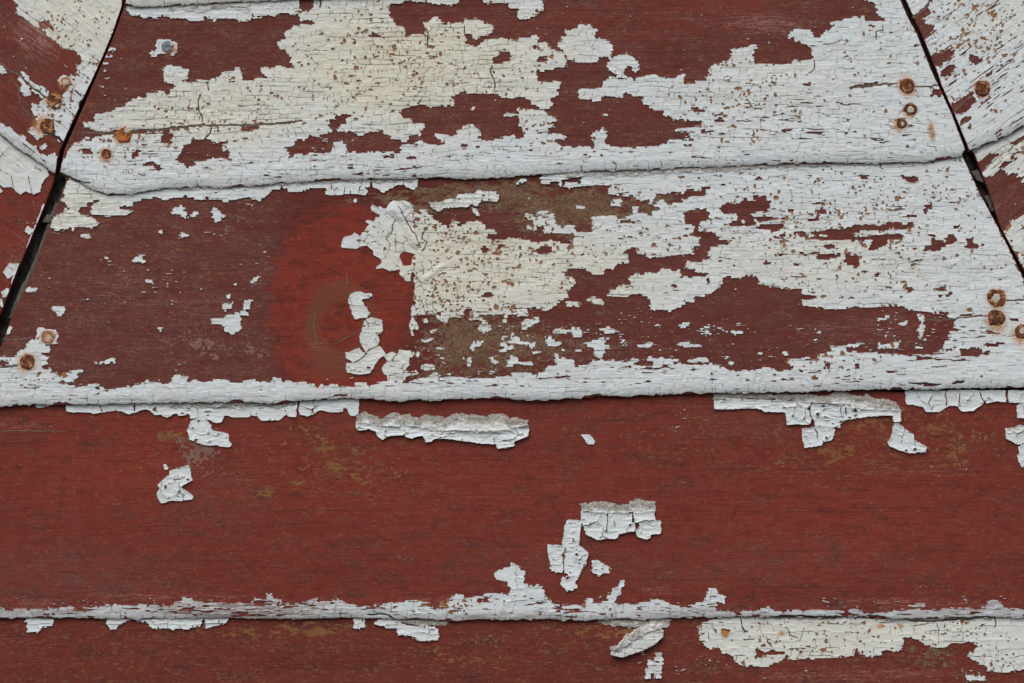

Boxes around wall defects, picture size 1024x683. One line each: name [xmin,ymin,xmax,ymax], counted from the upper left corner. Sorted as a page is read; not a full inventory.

crack [0,62,298,143]
crack [851,81,938,89]
crack [386,206,427,251]
peeling [0,0,1024,468]
crack [313,311,379,362]
crack [927,314,983,322]
crack [910,381,985,405]
peeling [0,510,1024,682]